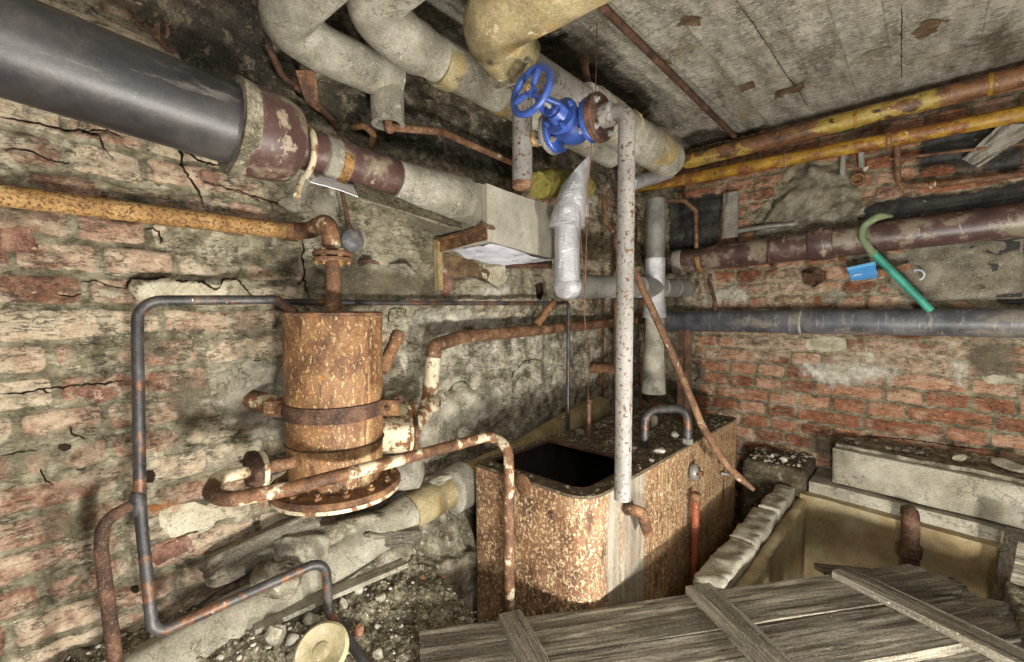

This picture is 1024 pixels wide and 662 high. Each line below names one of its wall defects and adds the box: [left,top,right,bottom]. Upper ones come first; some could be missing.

crack [897,6,905,77]
crack [1,148,70,164]
crack [1,117,120,158]
crack [178,150,279,205]
crack [55,276,251,298]
spalling [98,278,247,307]
spalling [803,267,850,304]
spalling [856,238,1024,301]
spalling [806,336,847,353]
crack [3,380,124,395]
spalling [981,371,1024,385]
spalling [152,502,227,565]